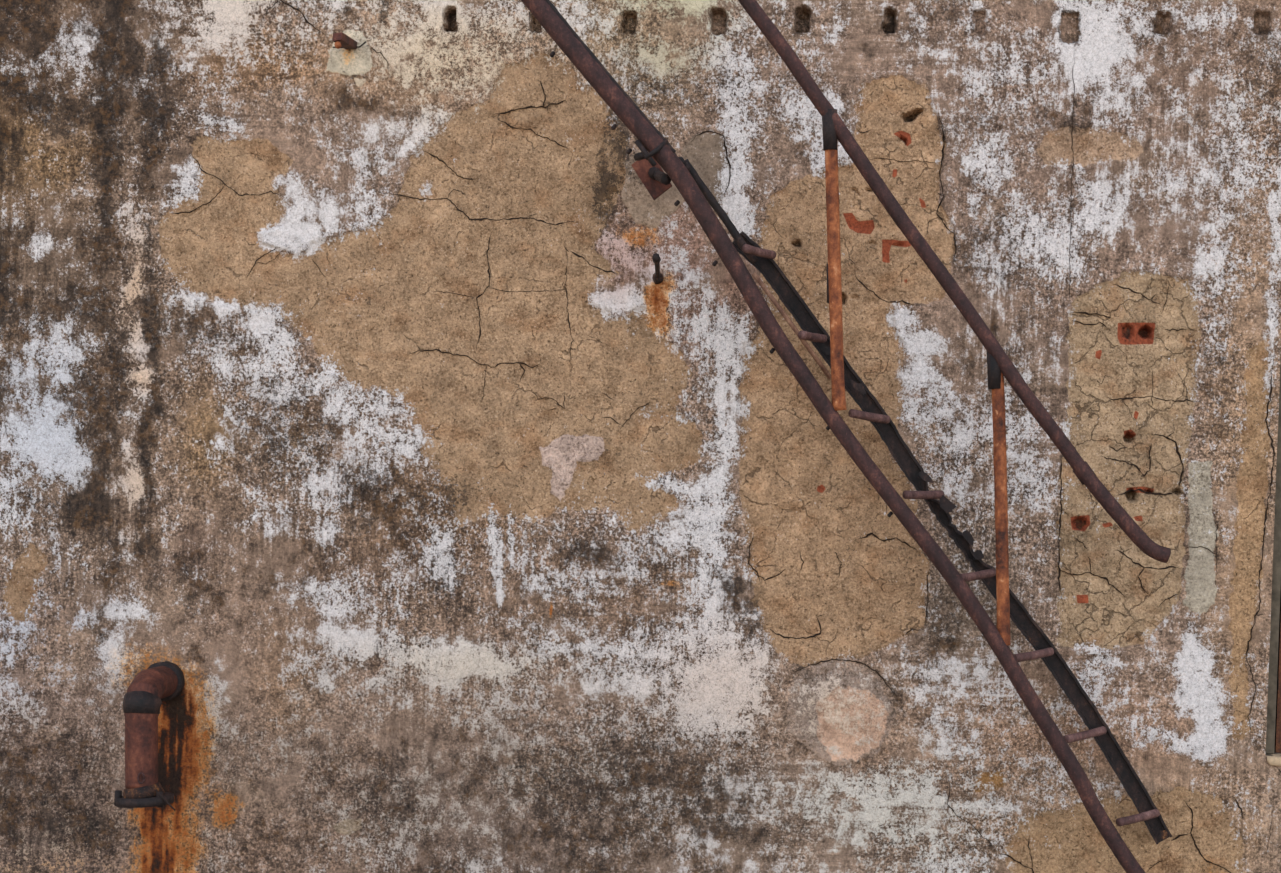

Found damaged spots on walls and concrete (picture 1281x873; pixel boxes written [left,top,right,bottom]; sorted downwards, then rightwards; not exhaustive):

damp [0,0,174,642]
peeling [103,597,150,625]
rust [94,634,249,873]
flaking render [116,0,957,748]
flaking render [1002,105,1281,873]